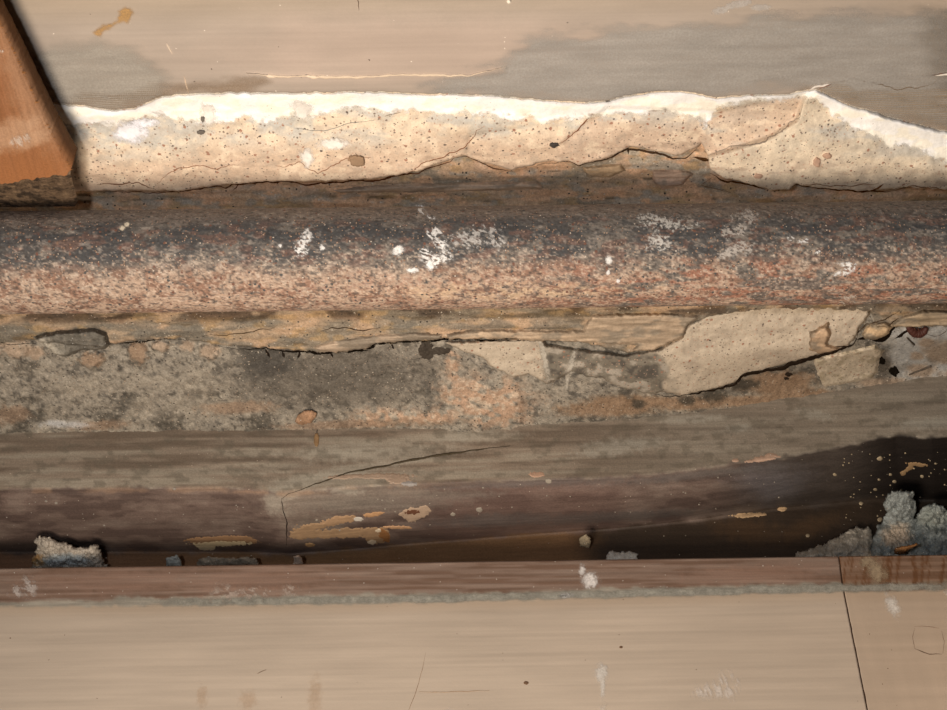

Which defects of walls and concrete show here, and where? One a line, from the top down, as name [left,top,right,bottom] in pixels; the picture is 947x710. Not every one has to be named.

crack [296,112,400,131]
crack [97,127,513,194]
crack [540,100,802,193]
crack [790,183,947,193]
crack [119,337,183,345]
crack [206,327,536,359]
peeling [313,313,704,353]
peeling [809,322,840,354]
peeling [862,309,947,340]
crack [281,446,507,545]
peeling [354,512,412,545]
peeling [186,541,252,551]